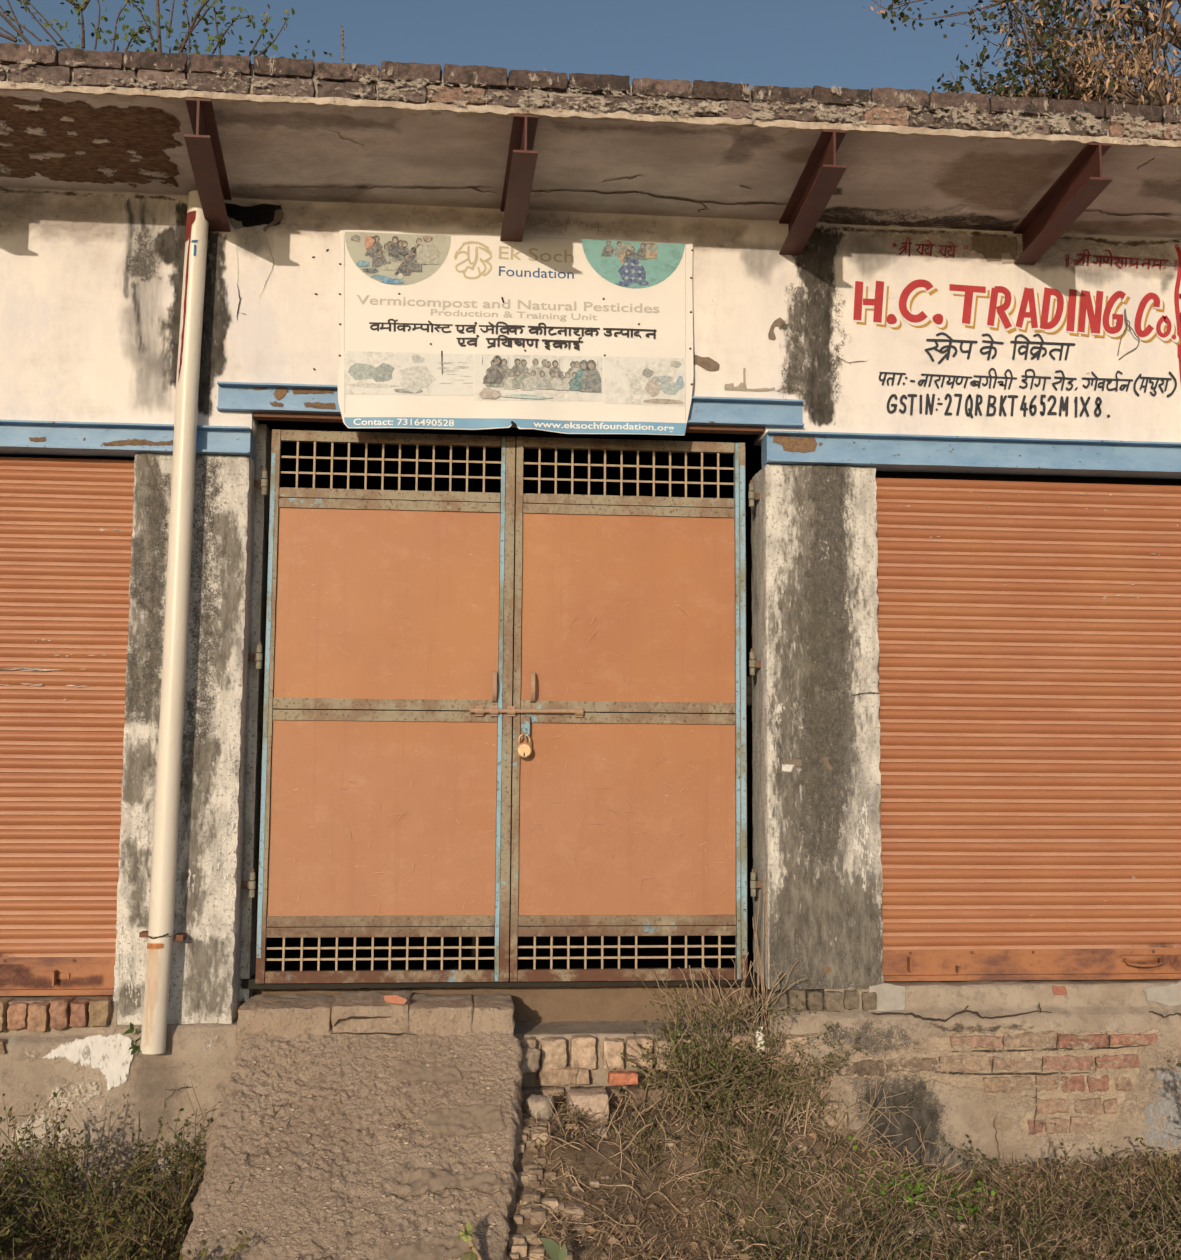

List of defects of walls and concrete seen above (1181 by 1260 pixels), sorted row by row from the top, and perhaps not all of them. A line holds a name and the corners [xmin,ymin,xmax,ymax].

peeling [0,97,182,188]
crack [263,186,498,194]
crack [531,175,787,232]
water stain [124,200,231,415]
water stain [779,155,1063,426]
water stain [122,453,171,812]
water stain [175,455,243,923]
water stain [769,465,883,989]
water stain [120,841,151,927]
water stain [183,936,229,1015]
peeling [10,1033,135,1153]
crack [871,1003,1149,1164]